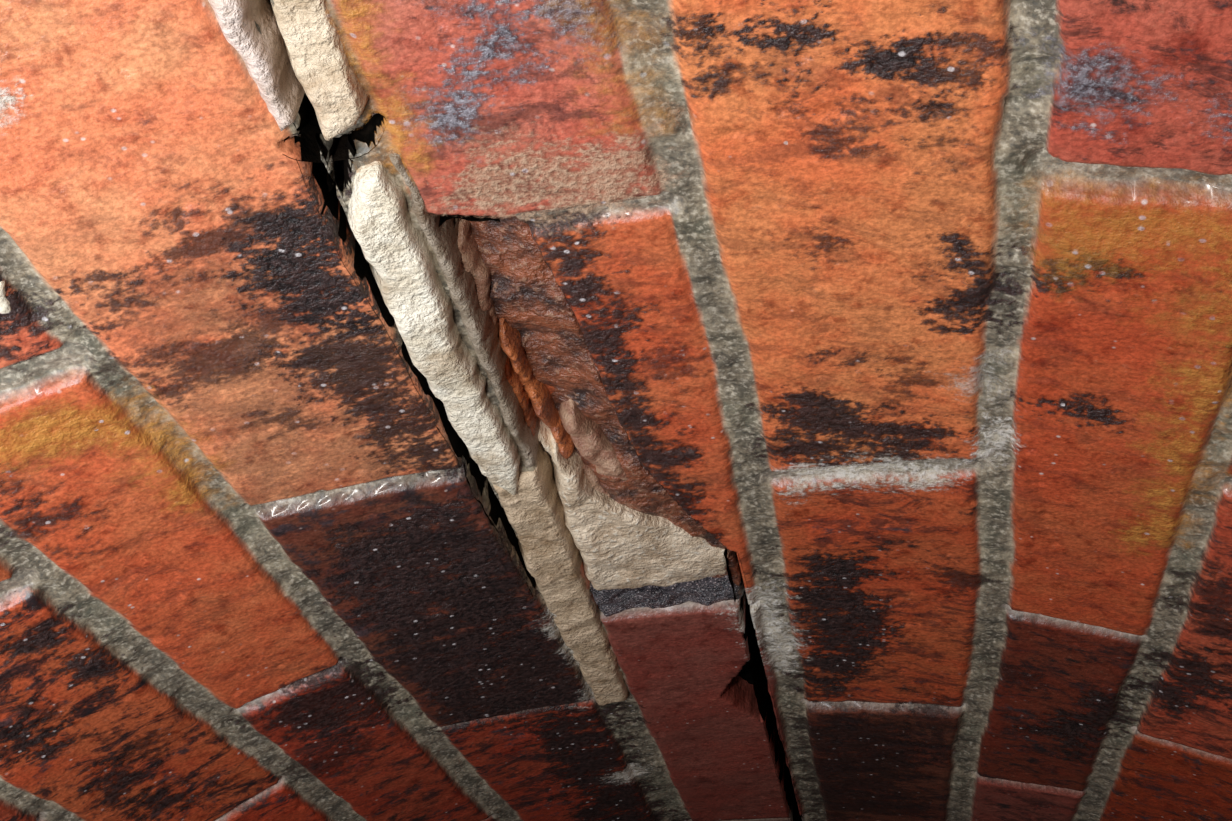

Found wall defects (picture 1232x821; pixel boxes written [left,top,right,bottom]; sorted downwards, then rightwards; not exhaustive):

crack [283,93,535,597]
spalling [438,214,745,617]
damp [544,609,579,665]
damp [606,763,654,783]
crack [723,548,802,821]